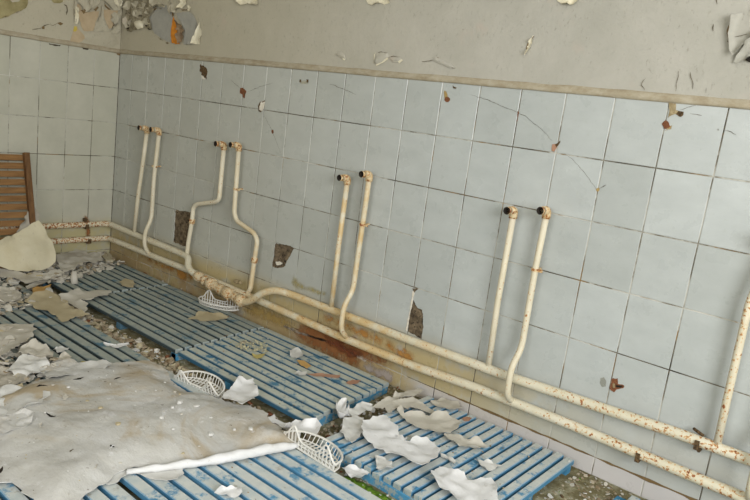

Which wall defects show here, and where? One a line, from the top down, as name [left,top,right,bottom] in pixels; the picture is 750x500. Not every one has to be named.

spalling [70,0,202,45]
peeling [727,11,750,63]
spalling [173,209,191,246]
spalling [272,243,294,268]
spalling [406,288,423,339]